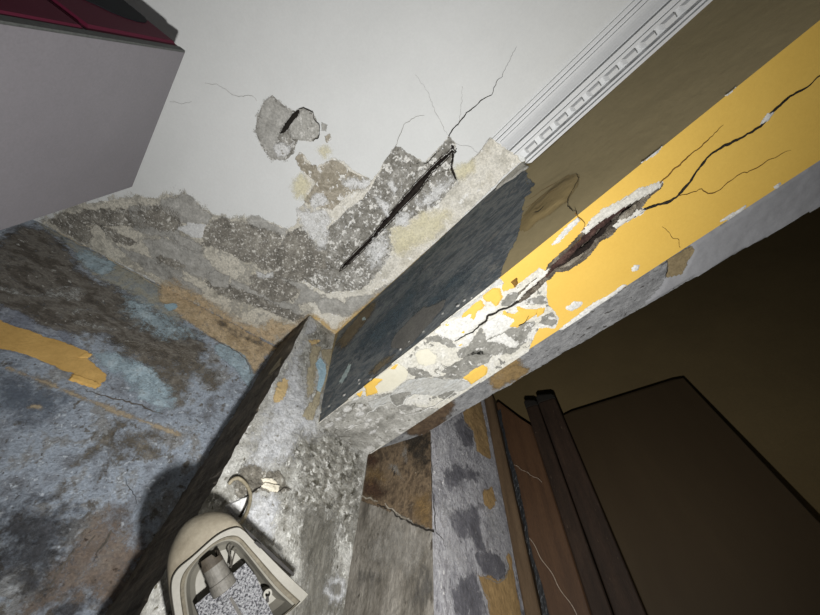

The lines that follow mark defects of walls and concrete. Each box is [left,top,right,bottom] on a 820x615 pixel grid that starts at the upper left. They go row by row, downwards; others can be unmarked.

crack [396,48,516,161]
crack [642,76,820,213]
peeling [37,95,664,459]
crack [567,176,585,248]
water stain [0,227,379,475]
water stain [0,482,145,615]
water stain [246,492,280,539]